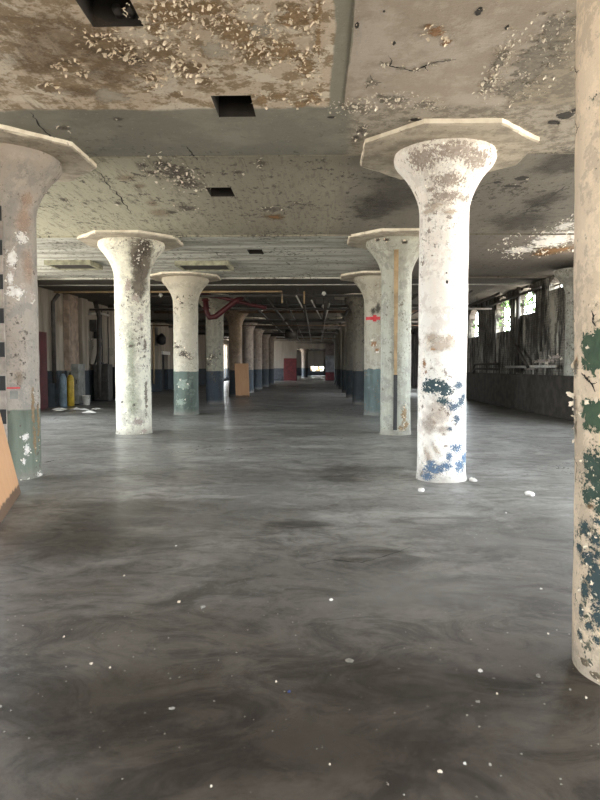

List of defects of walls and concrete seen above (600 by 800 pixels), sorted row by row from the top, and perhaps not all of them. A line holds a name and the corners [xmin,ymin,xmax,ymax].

peeling [36,80,61,94]
peeling [50,58,90,79]
peeling [71,0,452,142]
crack [366,58,456,88]
peeling [472,0,576,108]
peeling [135,151,209,197]
peeling [488,214,574,259]
peeling [4,229,35,304]
peeling [571,327,600,379]
peeling [421,347,465,431]
peeling [419,443,467,481]
peeling [566,392,600,647]